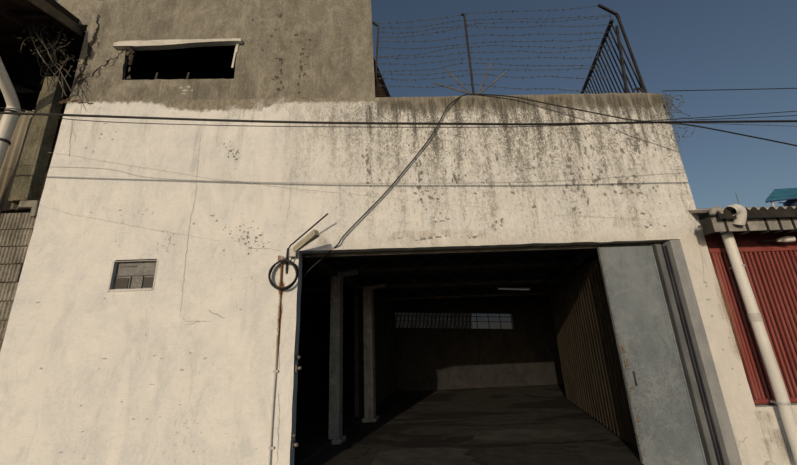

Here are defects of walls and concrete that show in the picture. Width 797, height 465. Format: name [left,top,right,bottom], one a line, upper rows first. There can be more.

crack [73,15,127,96]
damp [392,97,541,144]
damp [545,95,672,142]
crack [40,120,518,326]